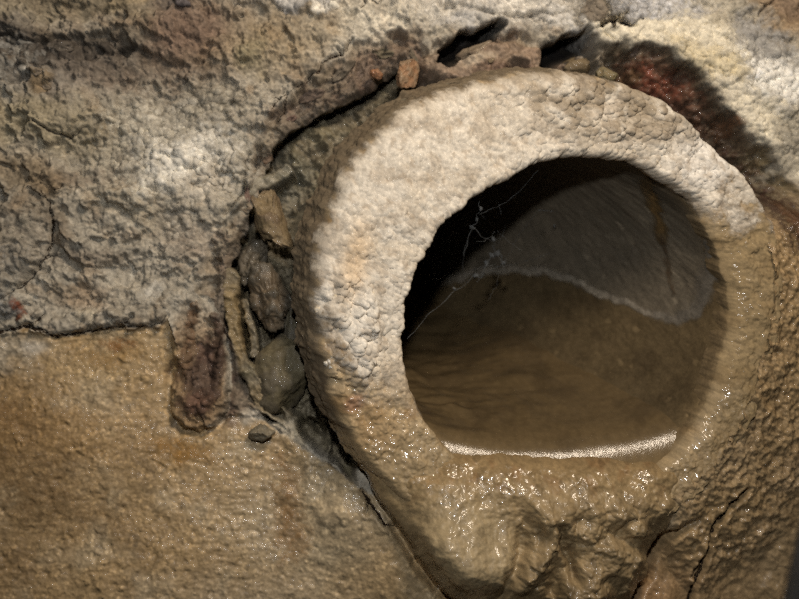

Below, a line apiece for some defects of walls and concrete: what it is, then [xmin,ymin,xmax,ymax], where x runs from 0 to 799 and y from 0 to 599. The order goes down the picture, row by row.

crack [0,184,63,300]
spalling [185,25,566,318]
spalling [557,30,799,205]
corrosion [613,54,799,249]
crack [0,314,167,338]
damp [365,453,678,599]
crack [687,491,744,599]